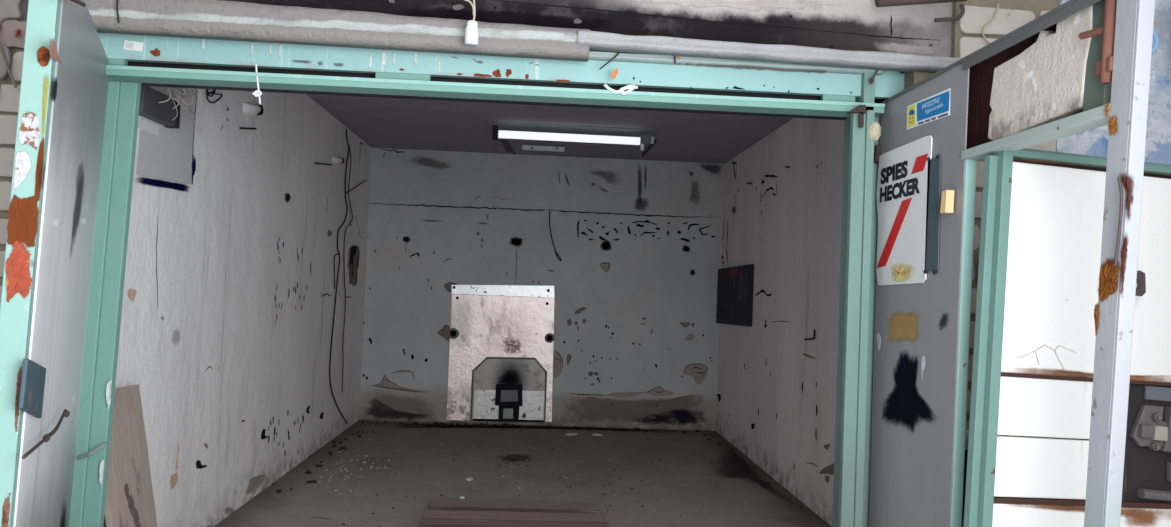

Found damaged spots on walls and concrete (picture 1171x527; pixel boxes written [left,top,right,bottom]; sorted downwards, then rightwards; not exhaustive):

peeling [13,112,40,190]
rust [1120,175,1134,218]
rust [1094,236,1129,335]